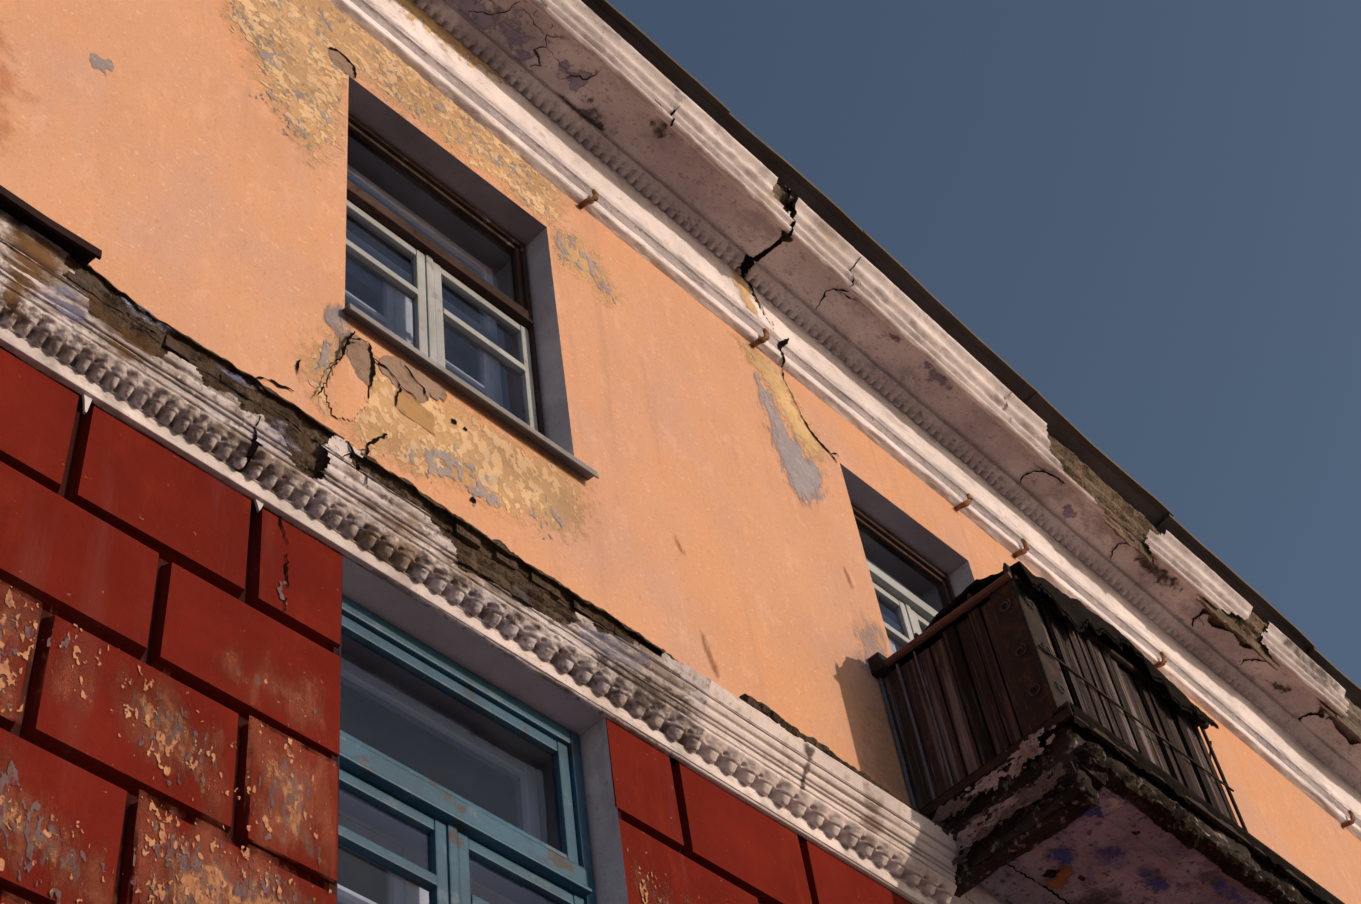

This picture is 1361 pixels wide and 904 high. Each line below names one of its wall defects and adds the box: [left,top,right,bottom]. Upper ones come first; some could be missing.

crack [468,0,600,80]
peeling [223,0,618,304]
crack [736,188,838,462]
peeling [0,586,109,719]
crack [236,416,261,473]
crack [277,516,289,610]
crack [256,331,429,484]
peeling [62,256,680,663]
spalling [1044,434,1161,566]
spalling [1195,594,1280,670]
peeling [110,653,336,904]
spalling [739,694,1313,904]